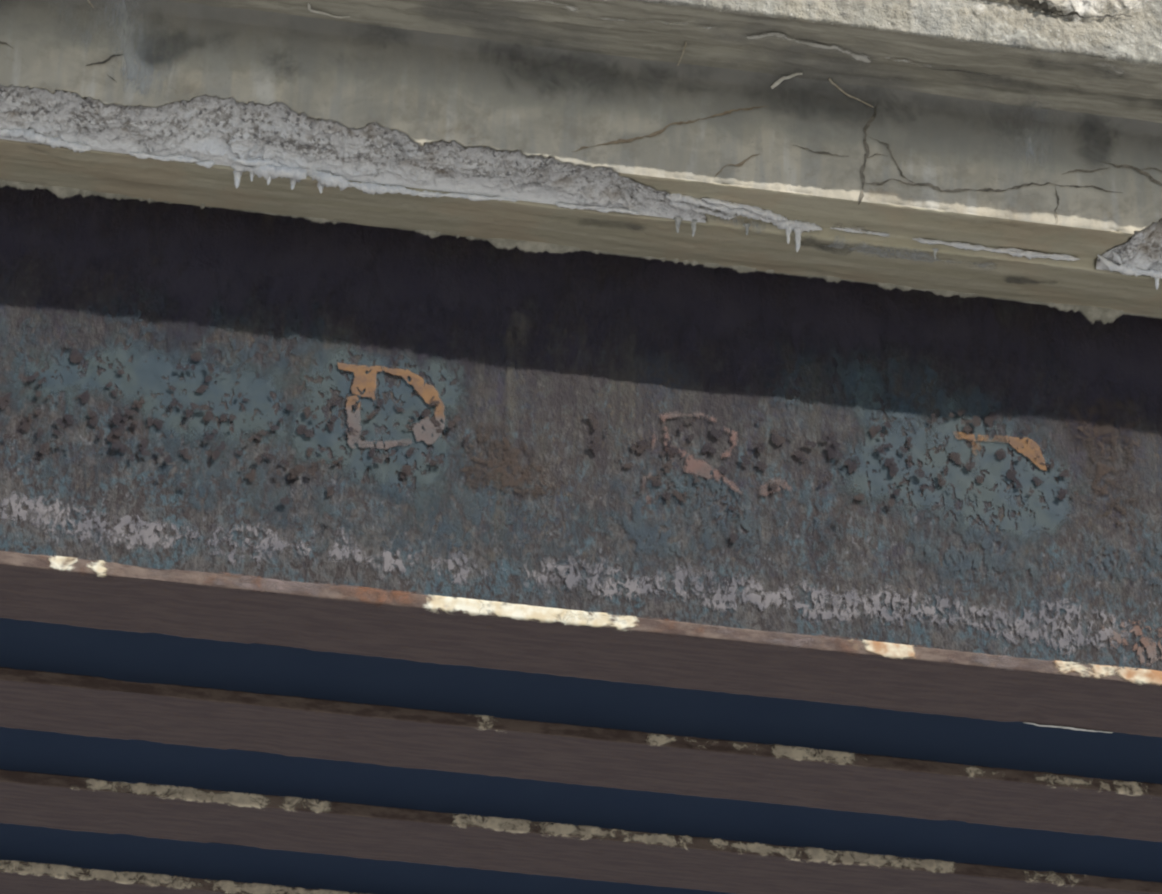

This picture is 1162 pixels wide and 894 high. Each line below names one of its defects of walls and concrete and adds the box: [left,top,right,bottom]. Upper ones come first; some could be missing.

crack [996,0,1132,19]
damp [0,128,92,153]
damp [230,158,519,202]
crack [573,106,765,152]
crack [795,103,1162,221]
damp [1097,251,1162,279]
corrosion [168,351,471,496]
corrosion [869,421,984,507]
peeling [49,556,107,577]
corrosion [339,585,413,603]
peeling [424,552,637,631]
peeling [522,557,1162,685]